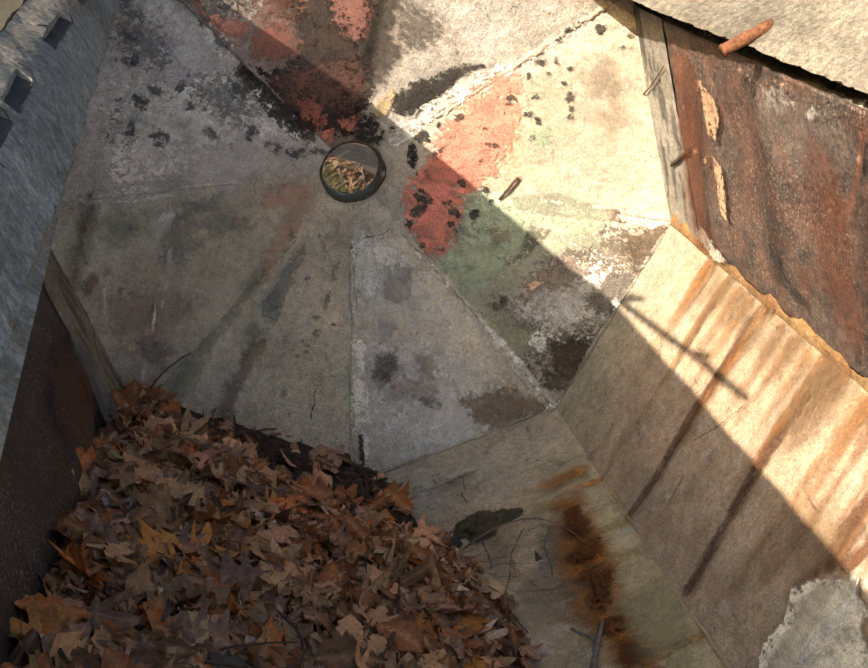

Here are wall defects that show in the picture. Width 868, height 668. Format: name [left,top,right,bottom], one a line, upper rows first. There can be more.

peeling [95,0,620,297]
peeling [696,80,719,140]
peeling [692,148,727,220]
peeling [262,243,311,320]
peeling [292,241,364,358]
peeling [383,264,412,303]
peeling [478,311,541,396]
corrosion [625,273,775,521]
corrosion [683,323,850,596]
corrosion [554,459,653,668]
corrosion [807,485,868,575]